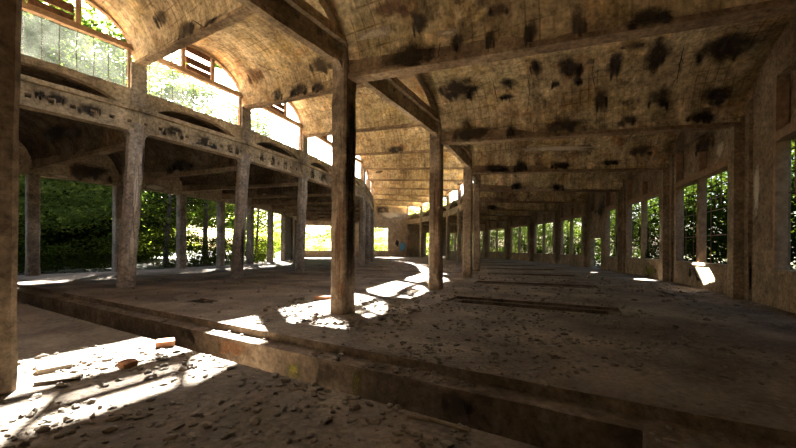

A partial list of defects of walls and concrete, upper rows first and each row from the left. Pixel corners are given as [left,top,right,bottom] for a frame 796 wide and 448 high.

leakage [154,11,166,28]
leakage [412,13,426,36]
leakage [310,55,332,75]
leakage [595,90,608,112]
leakage [648,86,670,112]